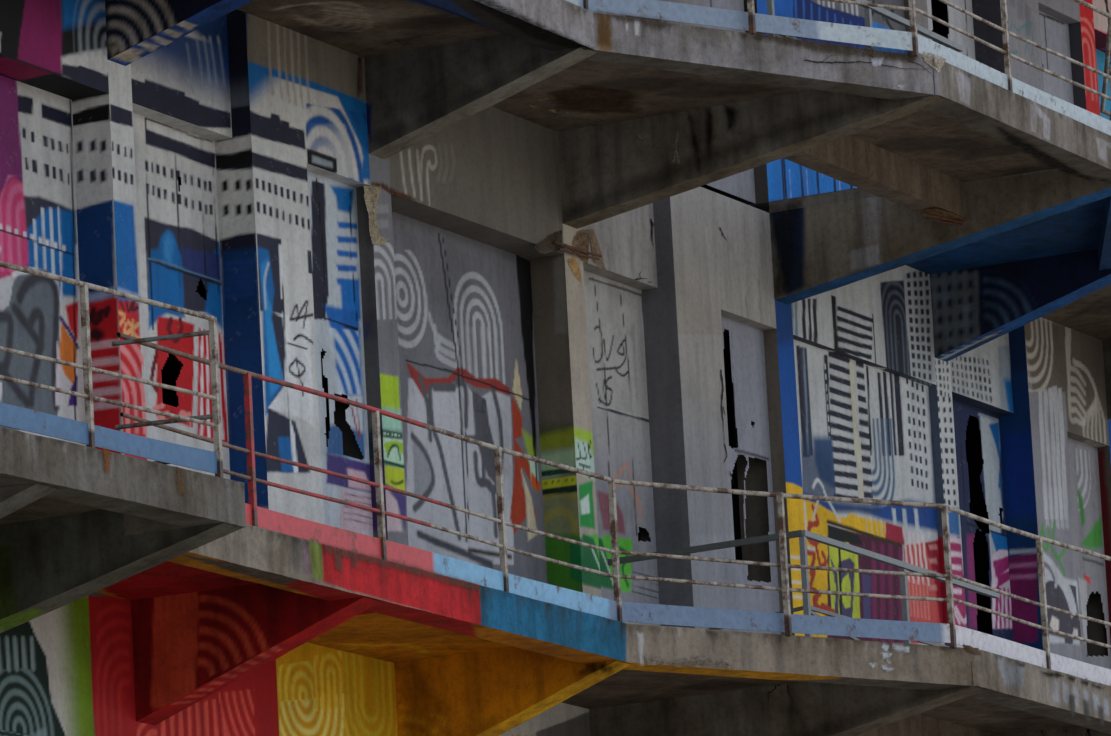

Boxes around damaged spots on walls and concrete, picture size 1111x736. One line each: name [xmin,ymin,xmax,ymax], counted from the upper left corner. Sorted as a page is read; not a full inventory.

spalling [364,184,389,246]
spalling [535,229,606,281]